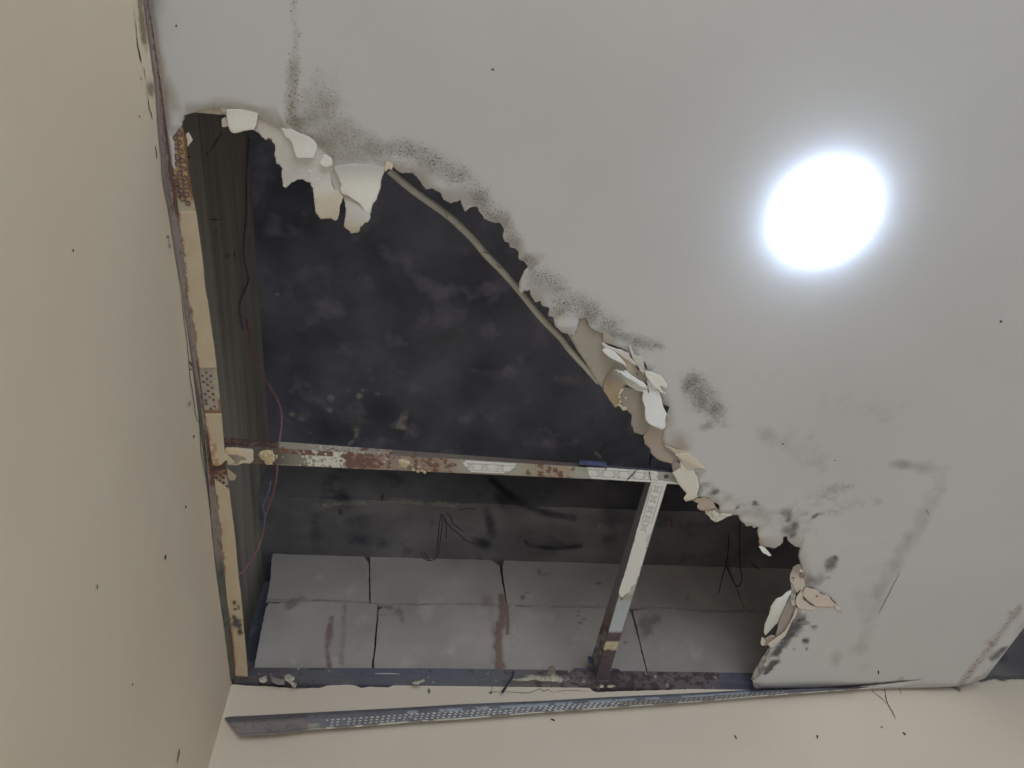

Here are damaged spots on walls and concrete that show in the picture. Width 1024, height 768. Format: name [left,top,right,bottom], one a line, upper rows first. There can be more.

leakage [388,139,664,349]
rust [495,595,513,669]
leakage [764,616,817,675]